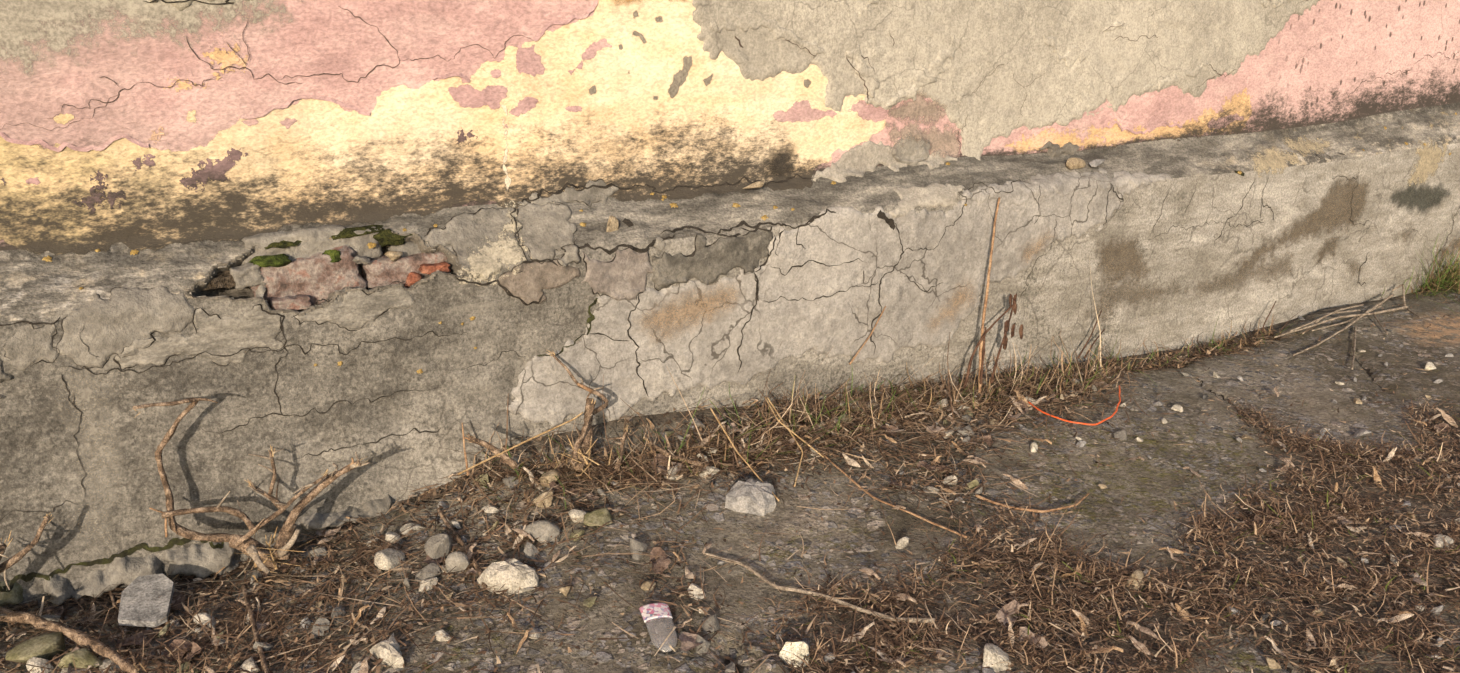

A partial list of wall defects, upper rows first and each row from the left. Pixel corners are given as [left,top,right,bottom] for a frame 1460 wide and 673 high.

peeling [0,0,888,316]
damp [501,105,511,189]
crack [455,61,1057,372]
damp [770,152,791,175]
crack [1103,185,1124,226]
peeling [1005,87,1253,155]
damp [1197,179,1368,290]
damp [1392,184,1447,211]
crack [0,281,648,520]